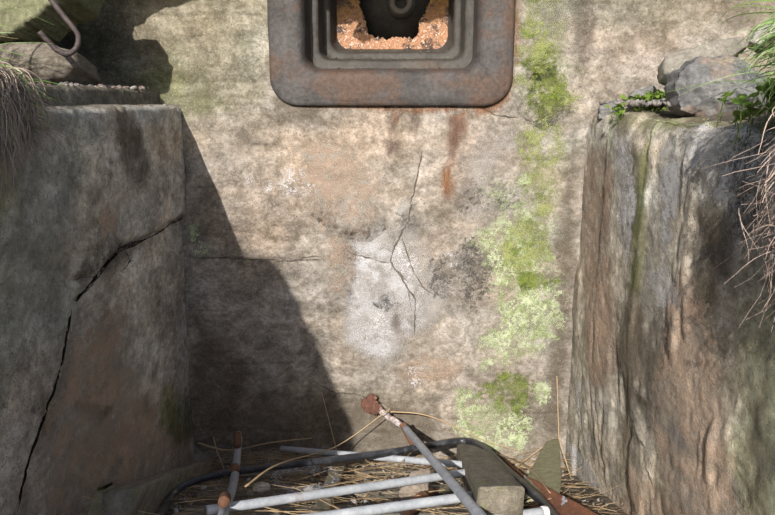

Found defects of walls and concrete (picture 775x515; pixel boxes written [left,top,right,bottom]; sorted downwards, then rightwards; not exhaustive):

corrosion [384,106,462,147]
crack [17,218,182,512]
leakage [354,242,422,357]
crack [347,152,430,332]